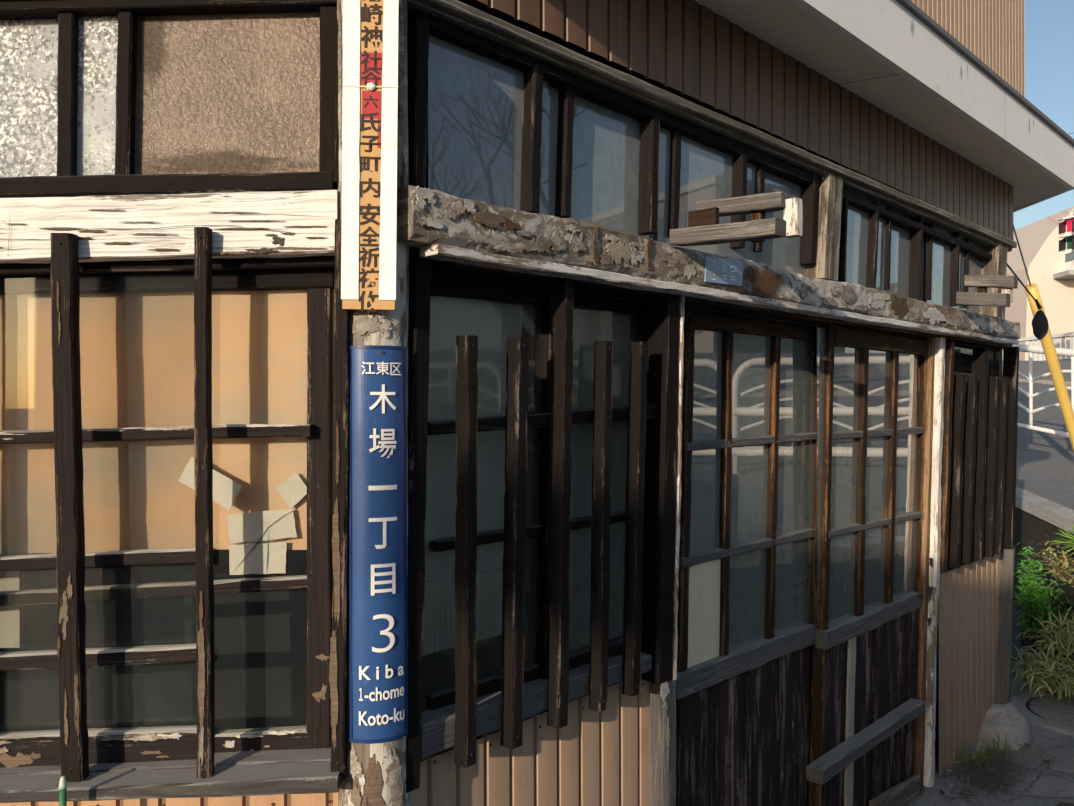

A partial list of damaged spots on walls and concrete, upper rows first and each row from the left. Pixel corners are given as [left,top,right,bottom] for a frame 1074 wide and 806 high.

peeling [397,0,696,280]
peeling [40,209,177,245]
peeling [210,211,327,255]
peeling [56,573,73,660]
peeling [312,420,341,750]
peeling [0,740,42,768]
peeling [101,733,182,758]
peeling [346,743,403,806]